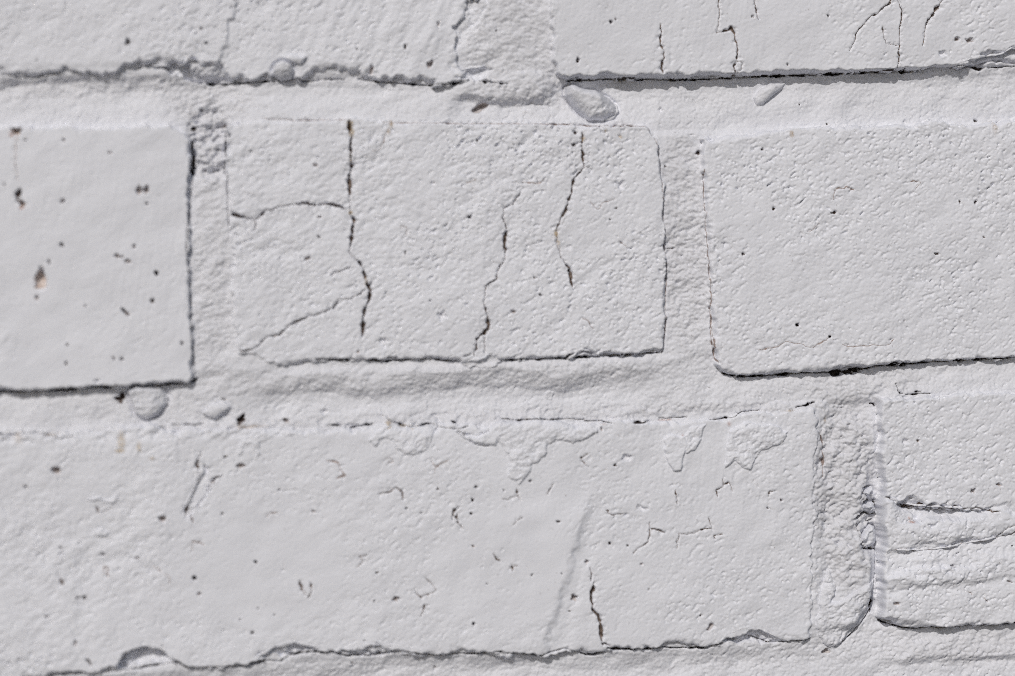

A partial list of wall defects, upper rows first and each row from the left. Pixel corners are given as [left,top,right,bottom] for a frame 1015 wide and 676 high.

crack [658,24,666,73]
crack [716,0,742,77]
crack [850,0,941,71]
crack [232,121,389,352]
crack [474,179,544,356]
crack [556,133,611,288]
crack [590,569,611,647]